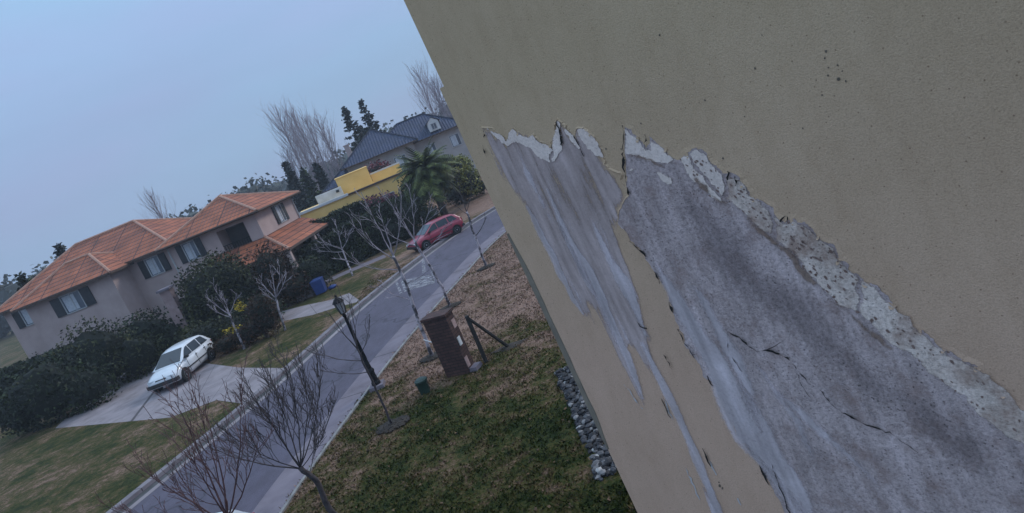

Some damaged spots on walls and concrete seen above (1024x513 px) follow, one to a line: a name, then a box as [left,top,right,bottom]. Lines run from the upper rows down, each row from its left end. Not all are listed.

peeling [480,117,1024,513]
crack [727,332,918,453]